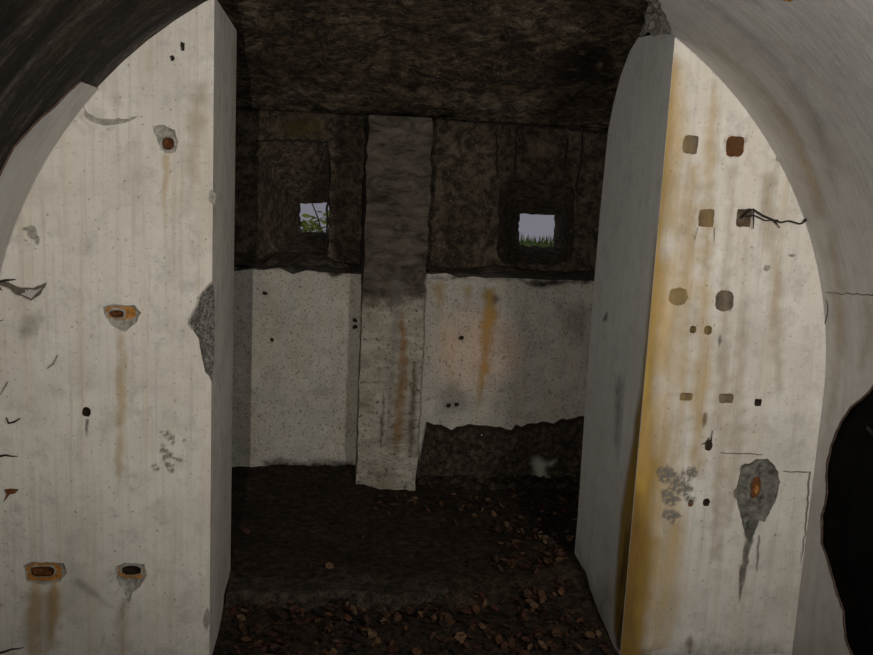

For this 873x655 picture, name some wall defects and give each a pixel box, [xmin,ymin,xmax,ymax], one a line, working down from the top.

spalling [153,125,178,154]
peeling [0,81,138,301]
spalling [103,304,141,332]
spalling [190,280,215,381]
corrosion [615,102,677,655]
peeling [639,0,873,655]
flaking render [416,416,584,479]
corrosion [26,563,63,636]